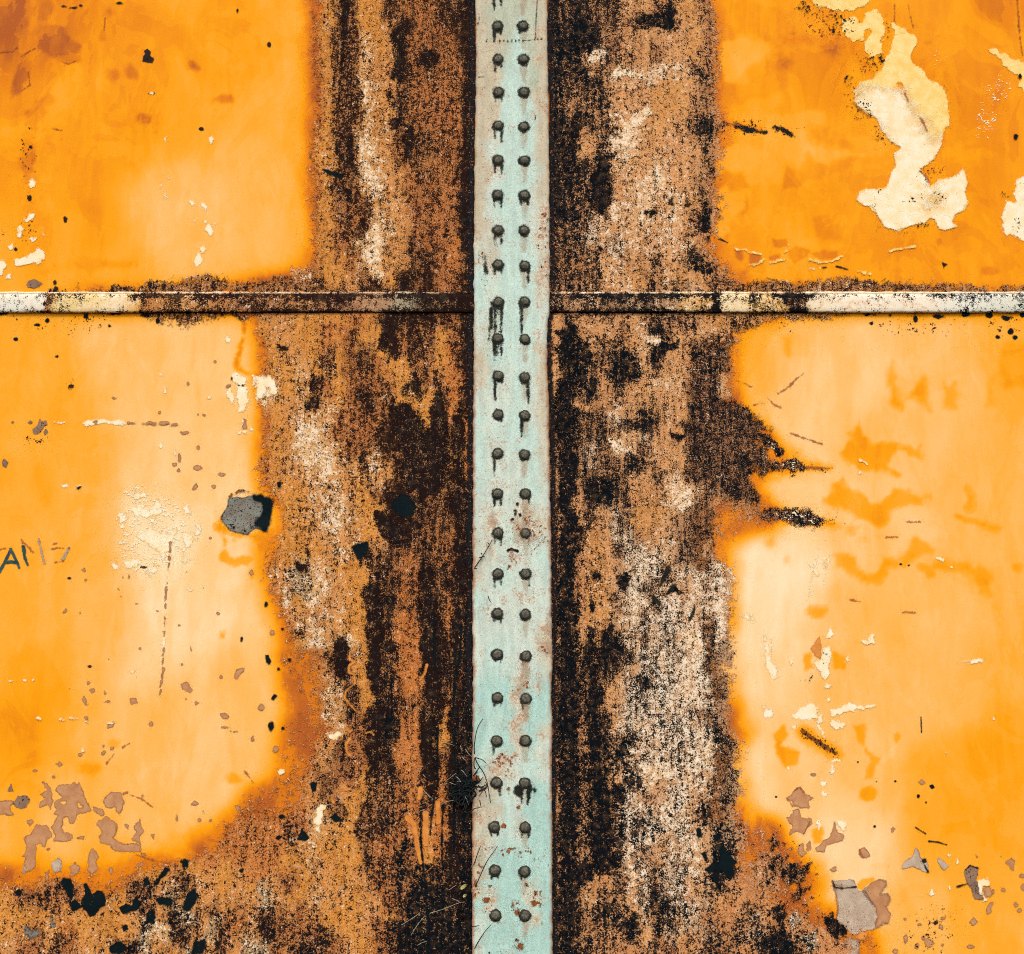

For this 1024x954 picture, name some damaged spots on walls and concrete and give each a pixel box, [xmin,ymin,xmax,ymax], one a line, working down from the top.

rust [0,0,88,140]
rust [48,0,505,356]
peeling [794,0,968,233]
peeling [1001,176,1024,241]
rust [485,0,1024,954]
peeling [40,420,291,766]
rust [0,312,536,954]
peeling [763,628,875,741]
peeling [0,761,198,954]
peeling [775,758,847,857]
peeling [830,866,891,954]
peeling [902,848,1006,926]